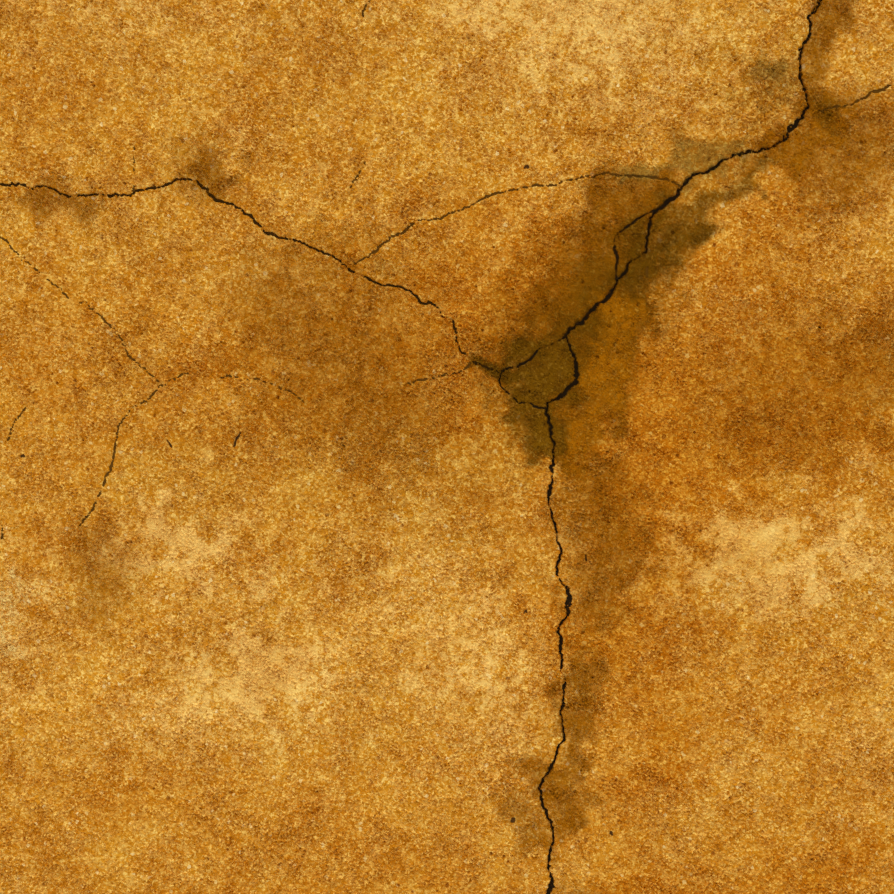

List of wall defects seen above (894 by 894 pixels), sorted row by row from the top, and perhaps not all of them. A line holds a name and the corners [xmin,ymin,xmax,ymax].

crack [820,84,891,113]
crack [0,0,822,671]
damp [471,174,751,465]
crack [538,681,566,894]